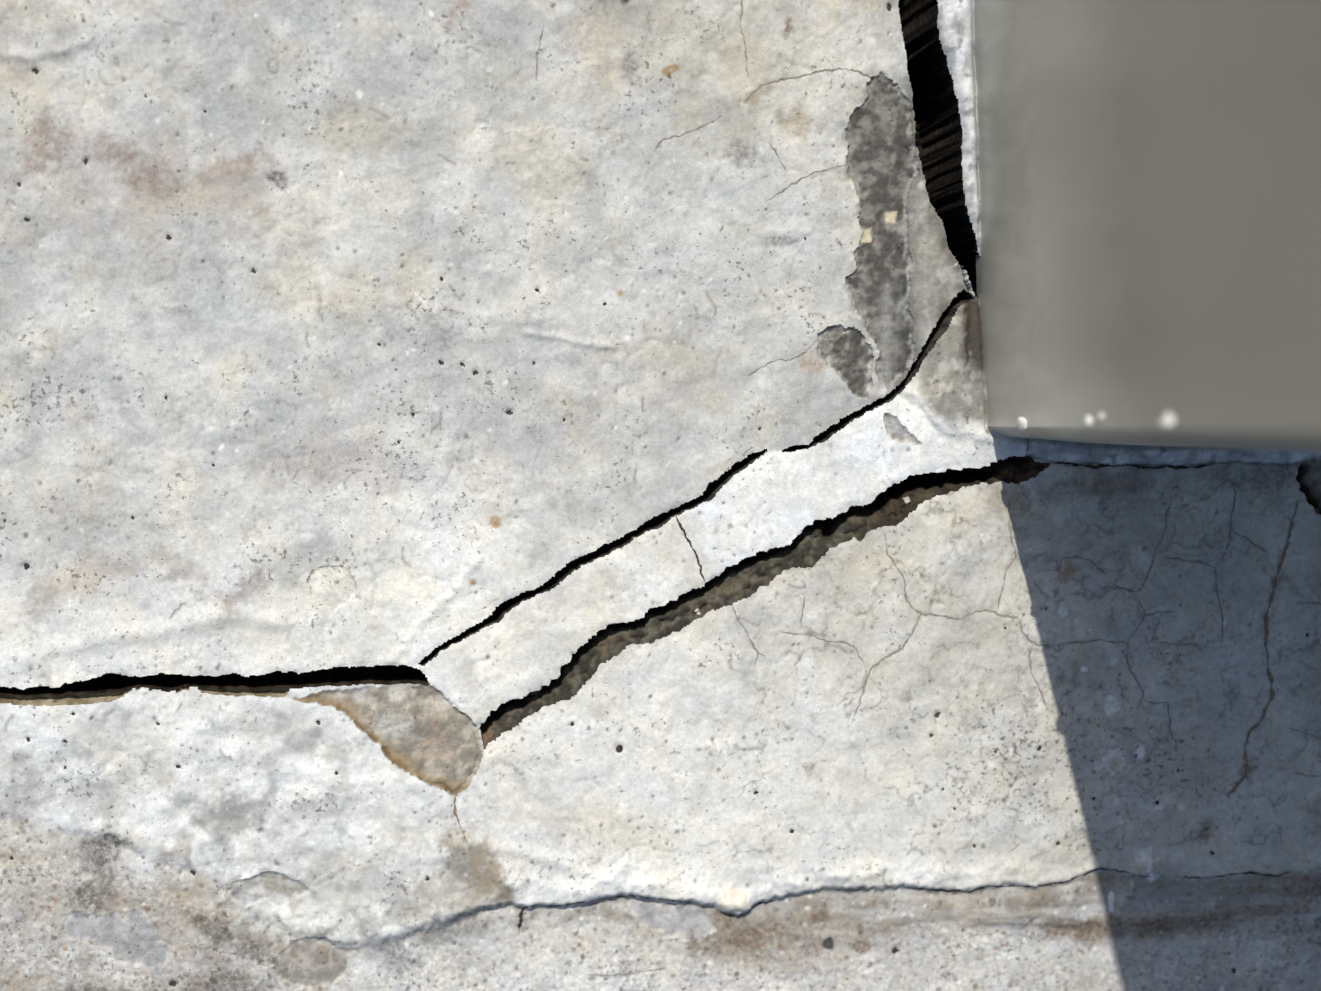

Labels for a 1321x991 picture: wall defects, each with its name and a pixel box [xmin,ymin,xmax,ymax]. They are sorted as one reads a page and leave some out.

crack [0,0,1298,796]
spalling [817,71,920,400]
spalling [1296,455,1321,515]
spalling [292,682,484,796]